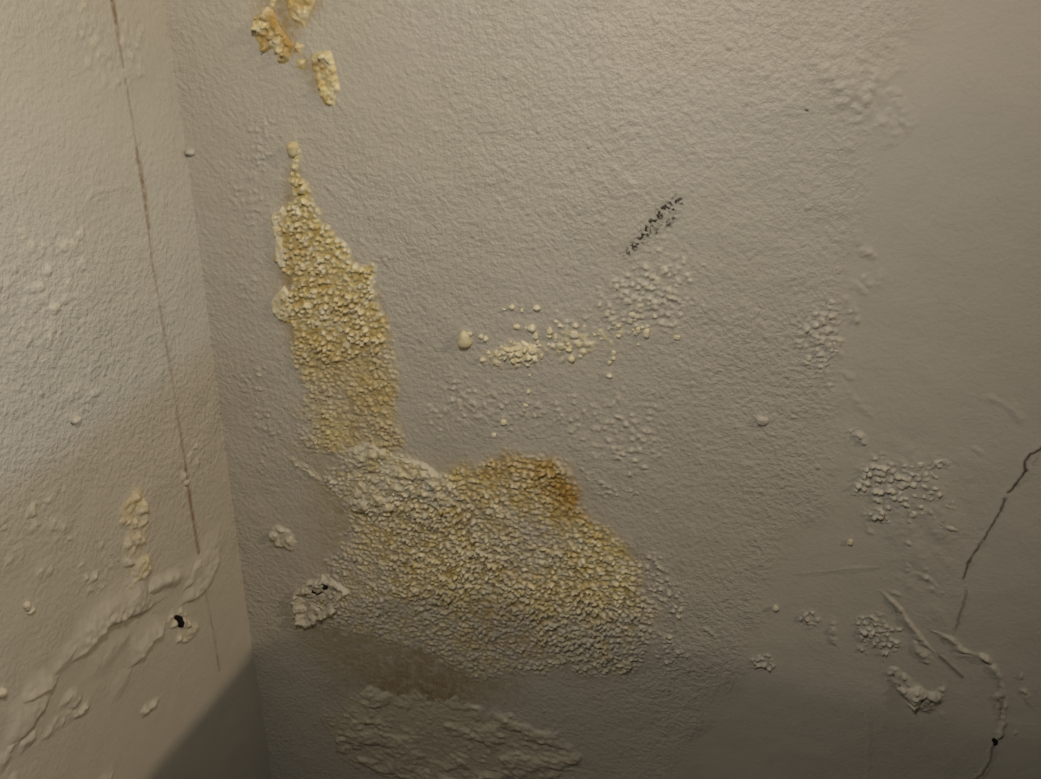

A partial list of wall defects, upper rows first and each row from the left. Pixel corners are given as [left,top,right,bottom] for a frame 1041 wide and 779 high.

damp [270,141,681,688]
spalling [878,589,965,728]
crack [928,437,1041,779]